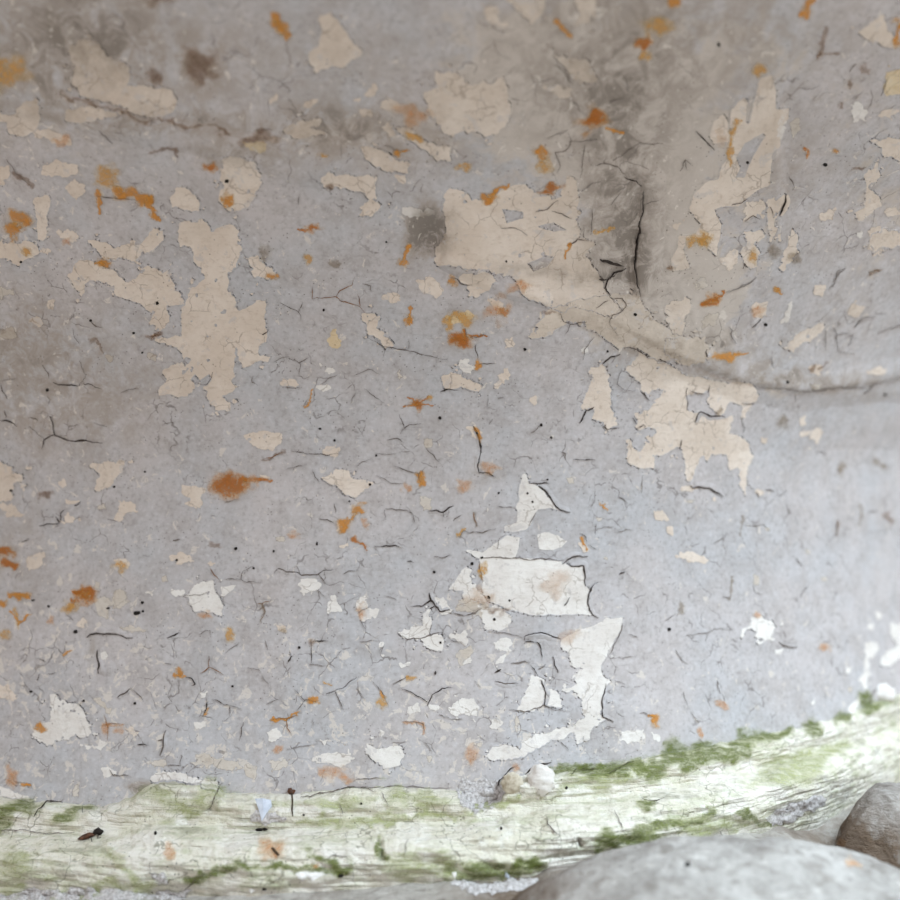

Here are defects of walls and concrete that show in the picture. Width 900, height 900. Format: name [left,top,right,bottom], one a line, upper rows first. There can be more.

rust [95,168,161,222]
peeling [0,141,277,416]
crack [537,130,667,401]
rust [442,311,487,348]
peeling [402,174,768,496]
crack [0,379,104,449]
crack [473,420,493,476]
rust [211,471,273,497]
peeling [397,472,632,762]
damp [558,759,648,780]
damp [594,807,716,854]
damp [445,856,547,881]